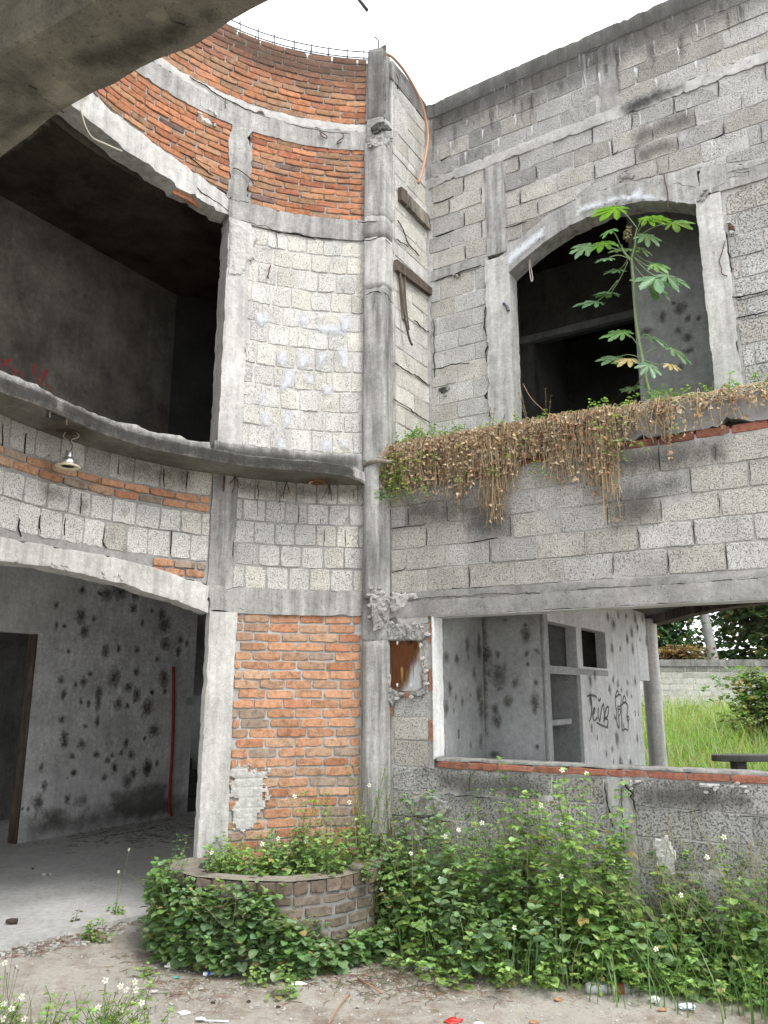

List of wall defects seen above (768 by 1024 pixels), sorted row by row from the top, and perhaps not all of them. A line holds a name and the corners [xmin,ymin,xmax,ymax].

spalling [367,121,393,148]
mould [112,670,167,712]
spalling [366,586,431,707]
rust [390,640,419,692]
mould [445,620,516,725]
damp [32,761,180,832]
flaking render [229,763,272,833]